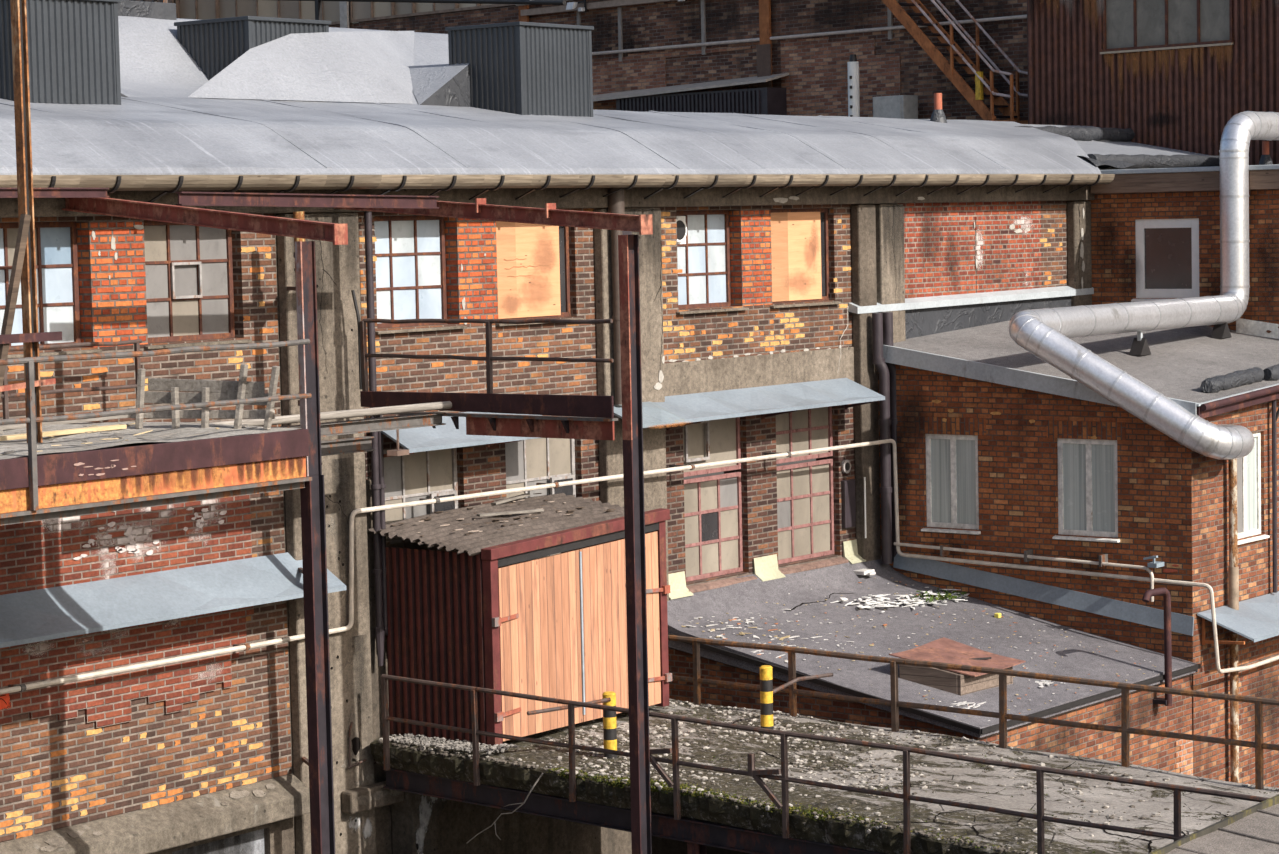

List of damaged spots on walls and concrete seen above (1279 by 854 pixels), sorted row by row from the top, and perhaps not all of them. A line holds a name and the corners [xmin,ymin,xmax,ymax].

corrosion [121,467,217,492]
corrosion [238,457,303,481]
peeling [183,507,227,531]
peeling [73,511,159,560]